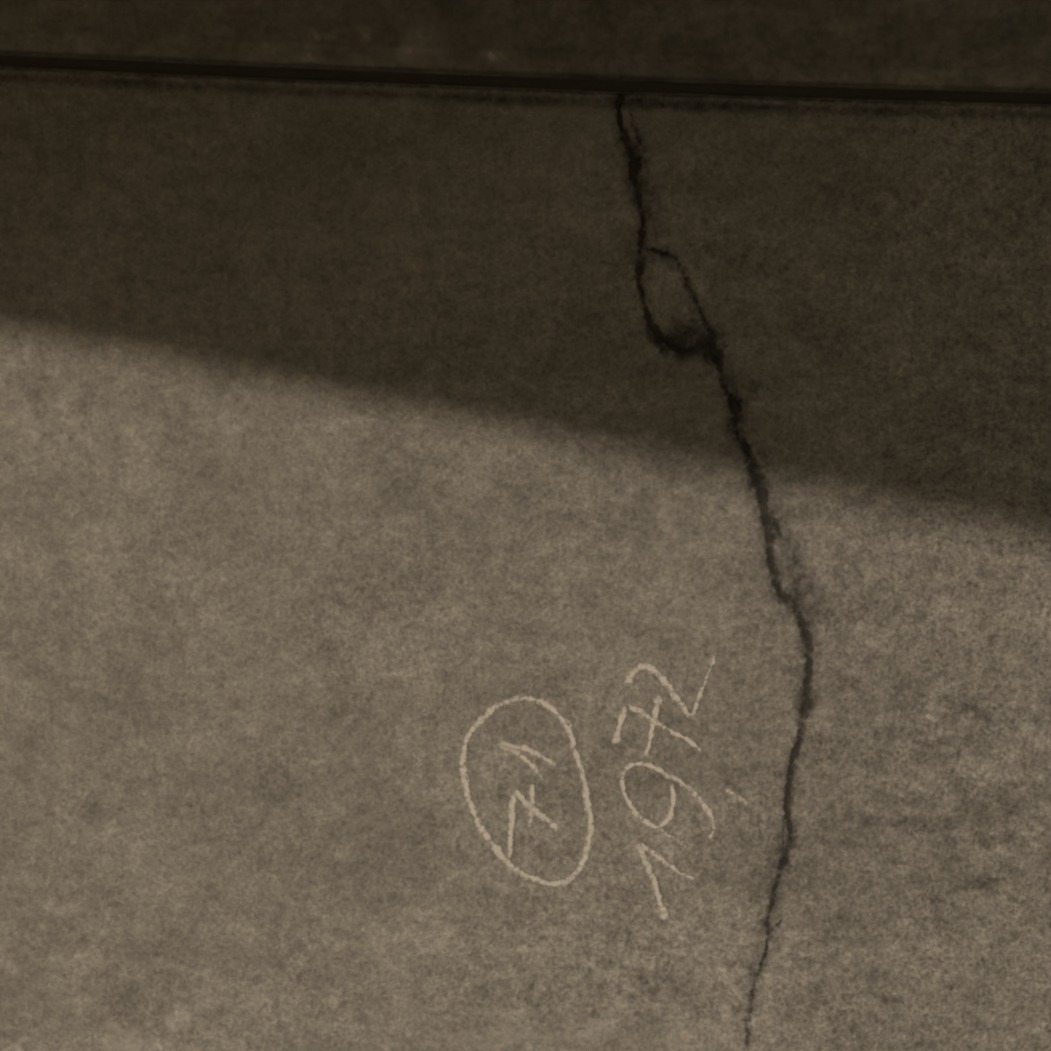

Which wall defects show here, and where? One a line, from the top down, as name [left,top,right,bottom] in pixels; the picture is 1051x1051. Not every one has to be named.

crack [615,94,816,1045]